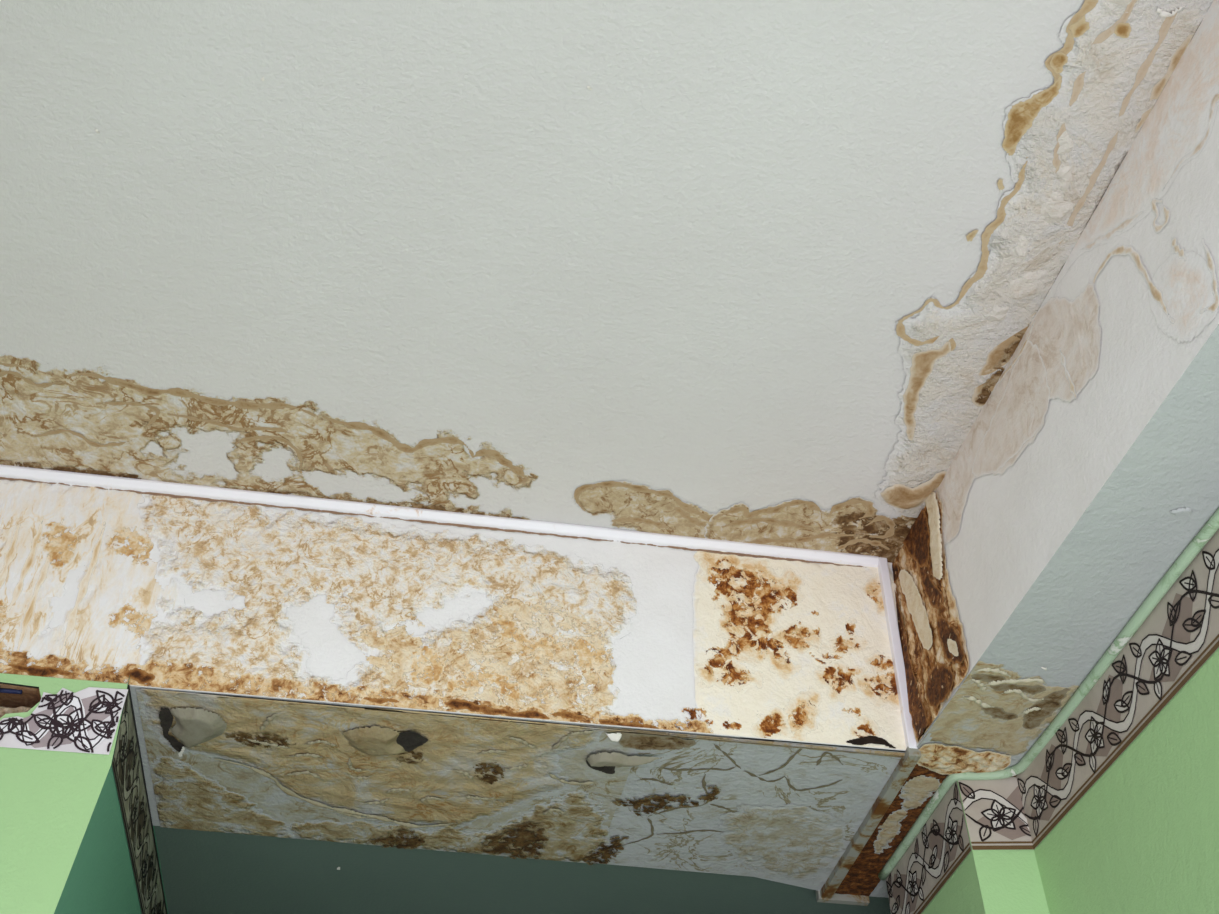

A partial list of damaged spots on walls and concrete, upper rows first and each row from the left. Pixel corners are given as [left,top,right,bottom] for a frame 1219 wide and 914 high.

flaking render [881,471,946,580]
damp [0,354,905,865]
flaking render [0,684,41,718]
peeling [586,732,902,774]
peeling [918,660,1079,756]
crack [596,726,932,884]
damp [718,804,848,882]